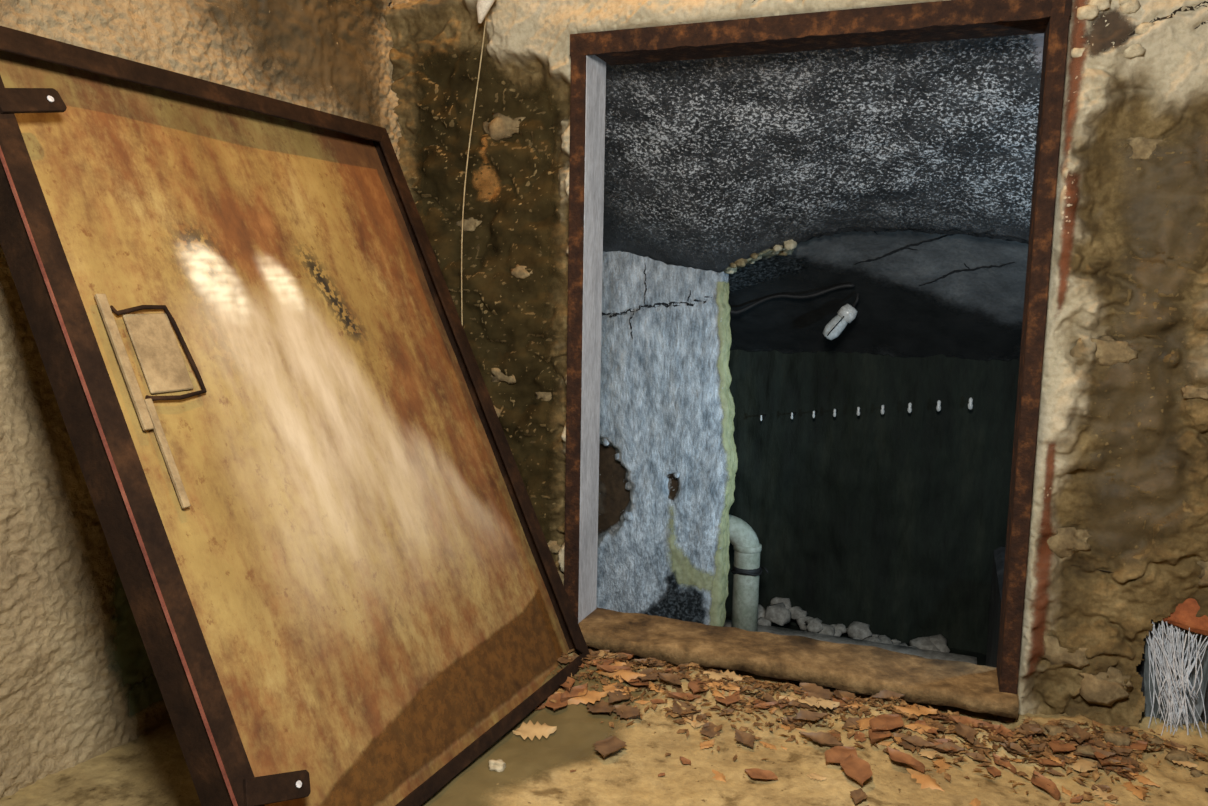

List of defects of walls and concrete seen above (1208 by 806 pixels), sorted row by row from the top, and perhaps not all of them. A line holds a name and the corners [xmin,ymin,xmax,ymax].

crack [796,226,1029,286]
peeling [414,50,562,556]
crack [602,265,712,339]
spalling [598,438,633,535]
spalling [667,472,680,501]